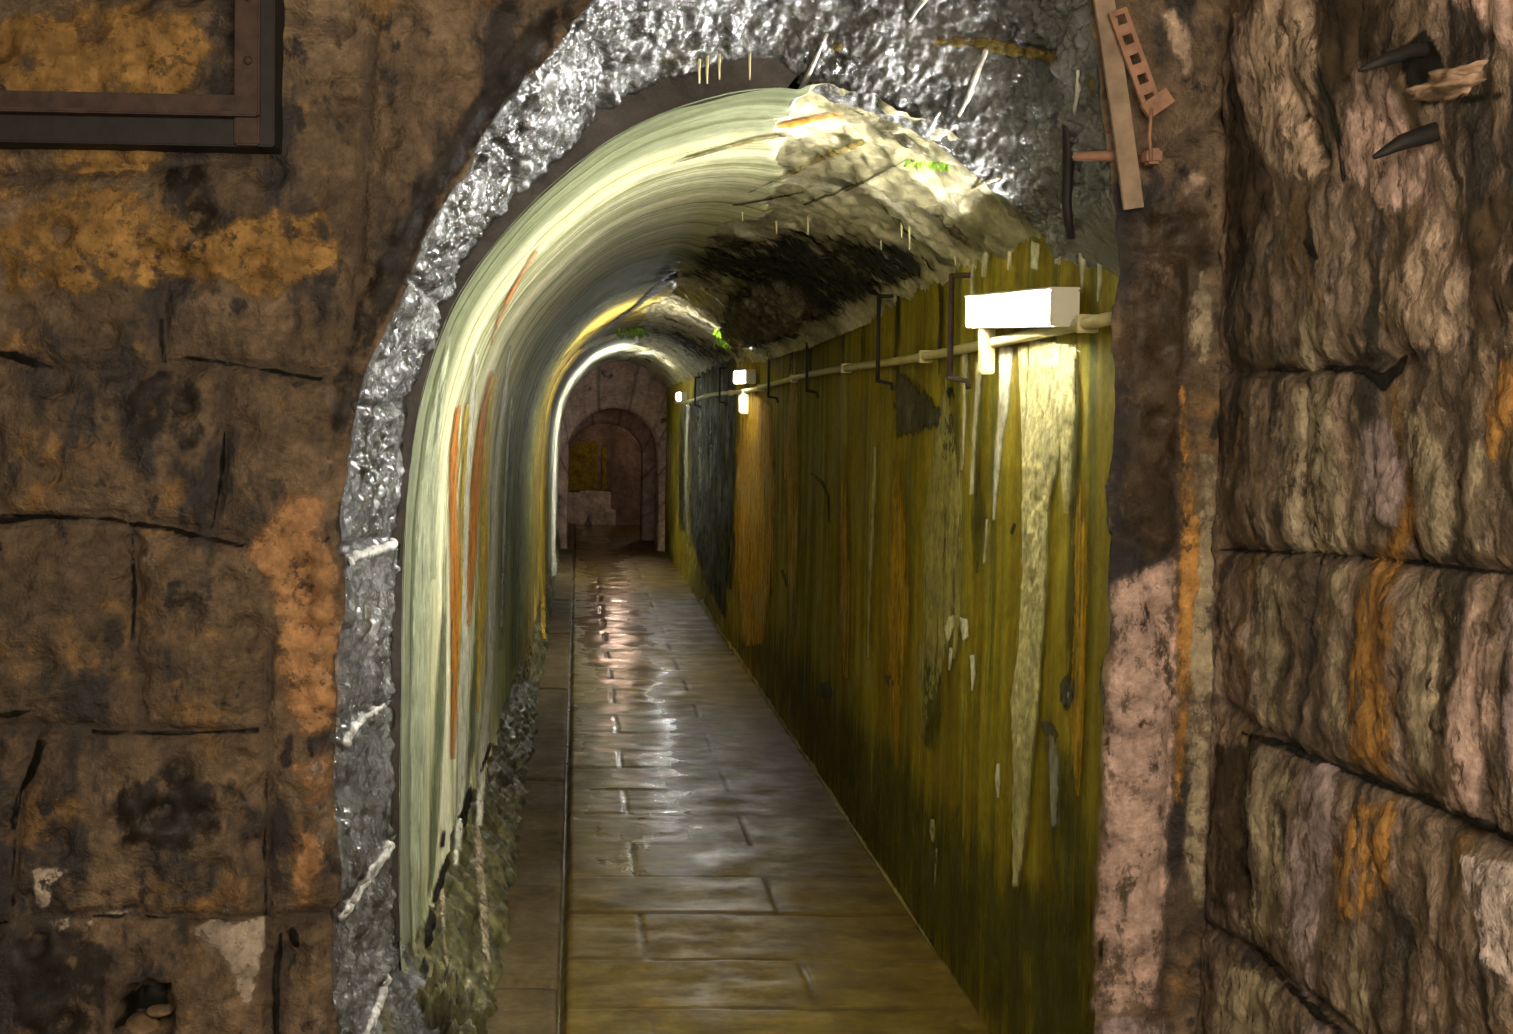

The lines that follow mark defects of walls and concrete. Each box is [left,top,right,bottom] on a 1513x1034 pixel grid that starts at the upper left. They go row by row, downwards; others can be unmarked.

corrosion [1485,360,1513,460]
damp [692,231,1087,887]
corrosion [1347,474,1414,774]
spalling [1060,674,1075,710]
corrosion [1333,797,1397,924]
spalling [124,1012,162,1034]